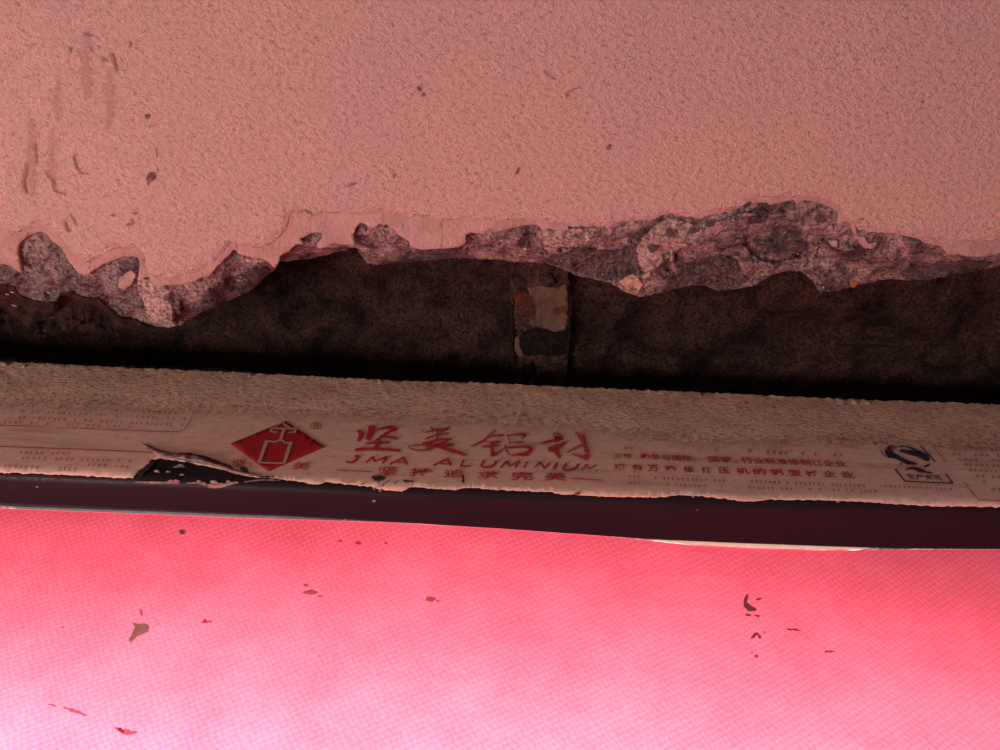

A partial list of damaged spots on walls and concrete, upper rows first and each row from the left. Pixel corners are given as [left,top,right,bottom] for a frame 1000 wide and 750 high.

spalling [0,196,1000,334]